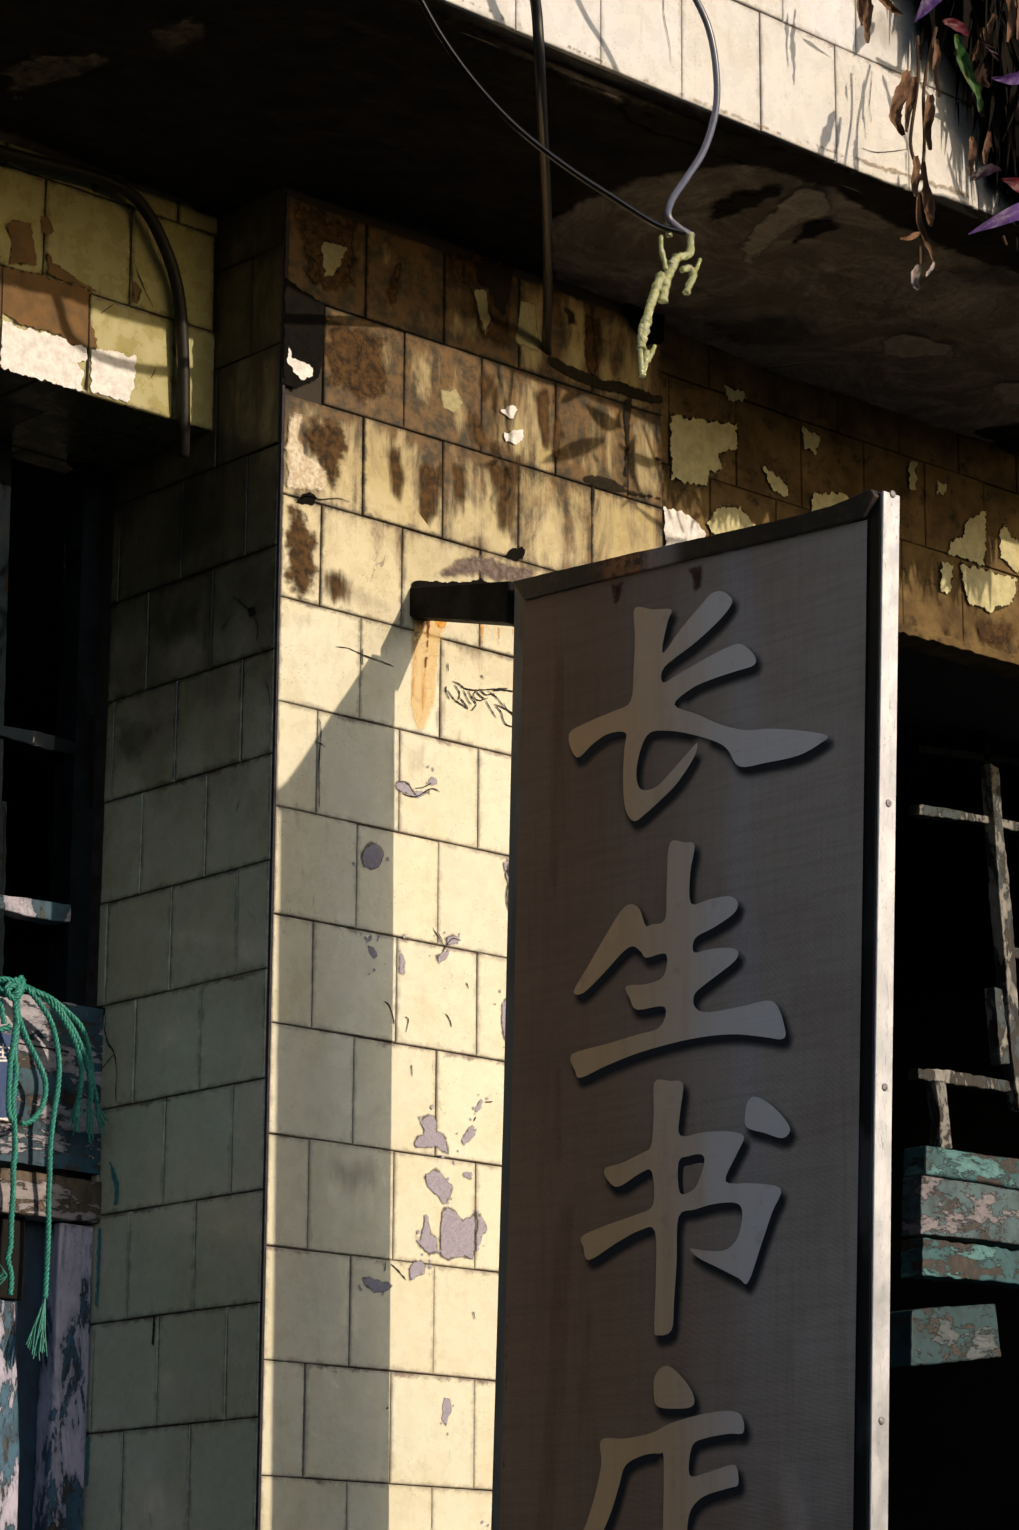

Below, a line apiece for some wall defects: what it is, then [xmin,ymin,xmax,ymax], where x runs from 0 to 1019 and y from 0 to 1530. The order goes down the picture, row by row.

spalling [0,215,137,402]
peeling [669,413,739,487]
peeling [763,466,788,497]
peeling [811,492,849,511]
spalling [663,504,755,546]
peeling [940,511,1019,614]
rust [413,619,446,705]
spalling [396,765,437,798]
spalling [352,842,389,870]
spalling [430,932,460,963]
spalling [409,1094,489,1280]
spalling [359,1277,392,1296]